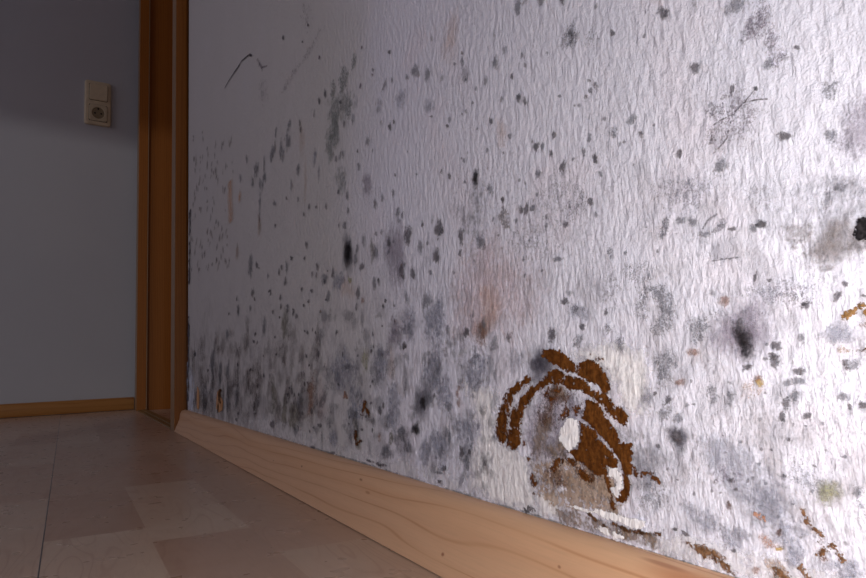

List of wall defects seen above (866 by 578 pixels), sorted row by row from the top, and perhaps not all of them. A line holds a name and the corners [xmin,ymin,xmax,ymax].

damp [344,242,364,269]
damp [814,217,866,258]
damp [654,288,676,335]
damp [417,388,435,413]
damp [253,402,409,476]
damp [439,308,826,578]